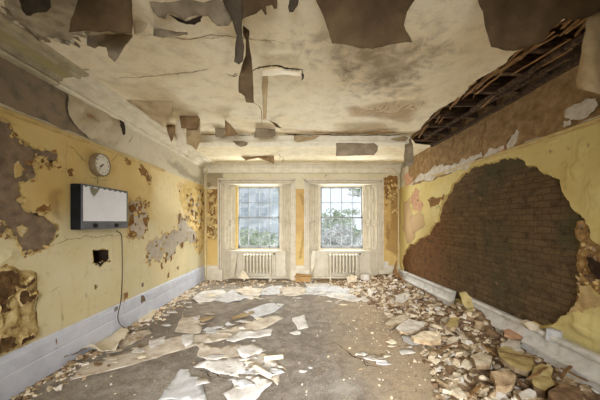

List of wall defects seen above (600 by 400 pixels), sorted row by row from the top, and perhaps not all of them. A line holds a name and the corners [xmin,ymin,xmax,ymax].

peeling [60,33,92,48]
crack [176,34,282,43]
peeling [0,116,76,258]
peeling [126,182,217,278]
flaking render [384,54,600,327]